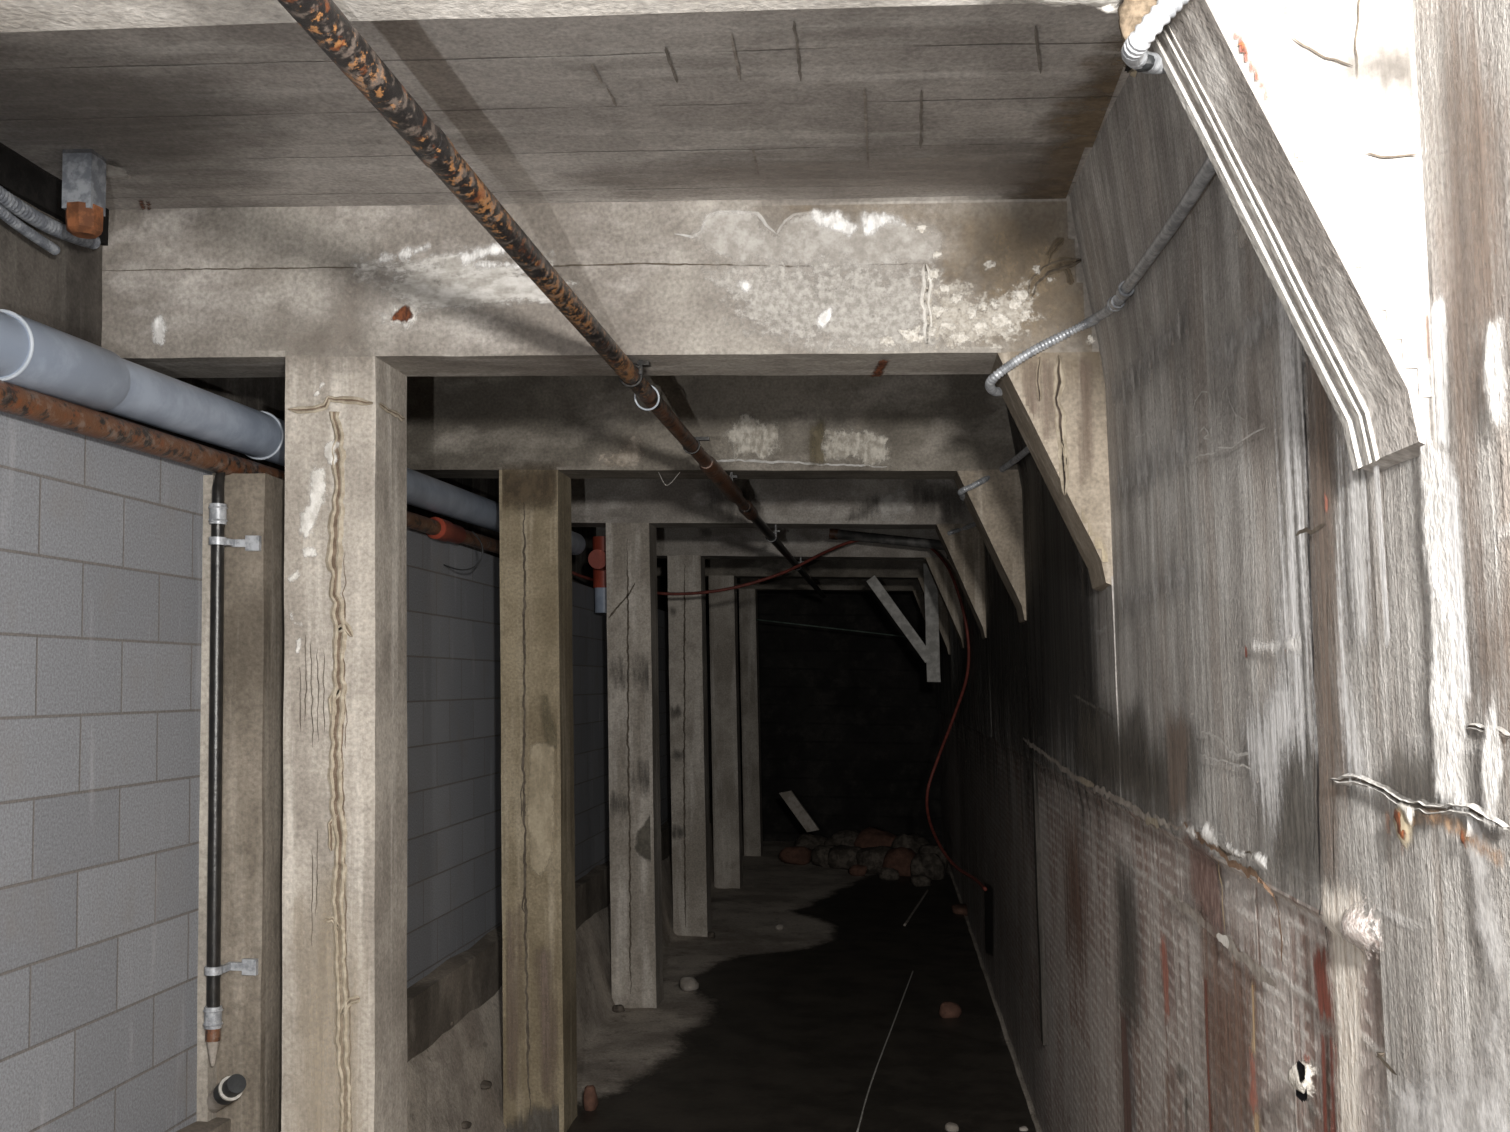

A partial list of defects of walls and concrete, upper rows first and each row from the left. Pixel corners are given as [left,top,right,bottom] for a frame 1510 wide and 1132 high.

leakage [355,244,551,309]
leakage [676,210,1095,352]
leakage [725,413,782,461]
leakage [809,421,893,466]
crack [288,396,405,1132]
leakage [935,286,1390,1132]
corrosion [1183,822,1283,962]
crack [1296,345,1510,955]
corrosion [1412,808,1502,859]
corrosion [1249,985,1259,1132]
spalling [1288,1055,1314,1125]
corrosion [1313,947,1341,1132]